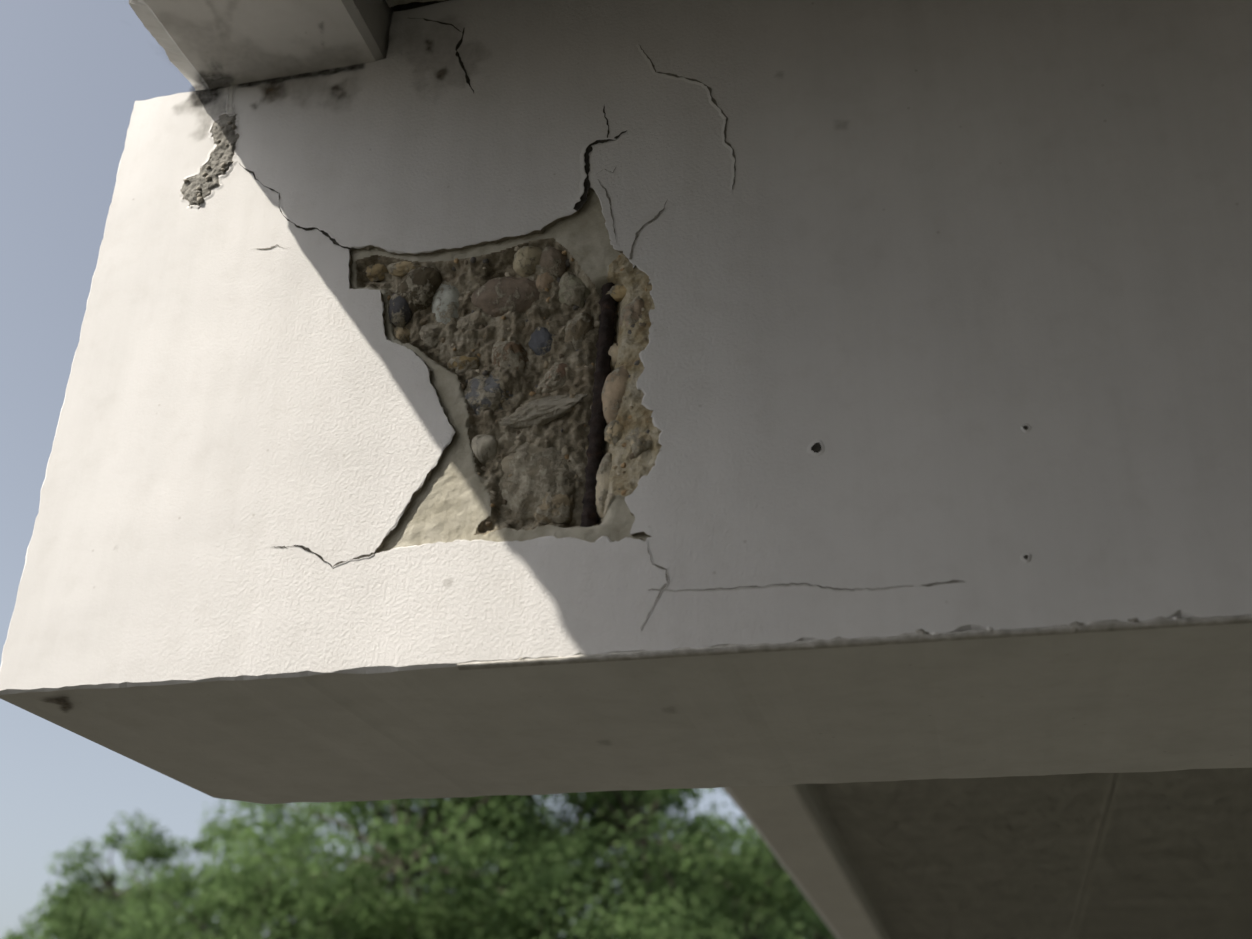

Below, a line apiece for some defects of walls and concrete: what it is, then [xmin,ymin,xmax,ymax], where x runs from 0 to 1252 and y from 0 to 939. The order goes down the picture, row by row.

crack [410,18,474,93]
peeling [178,112,243,209]
crack [239,163,352,250]
crack [570,106,667,259]
crack [636,44,736,189]
spalling [350,190,662,553]
crack [277,545,374,569]
crack [641,538,965,631]